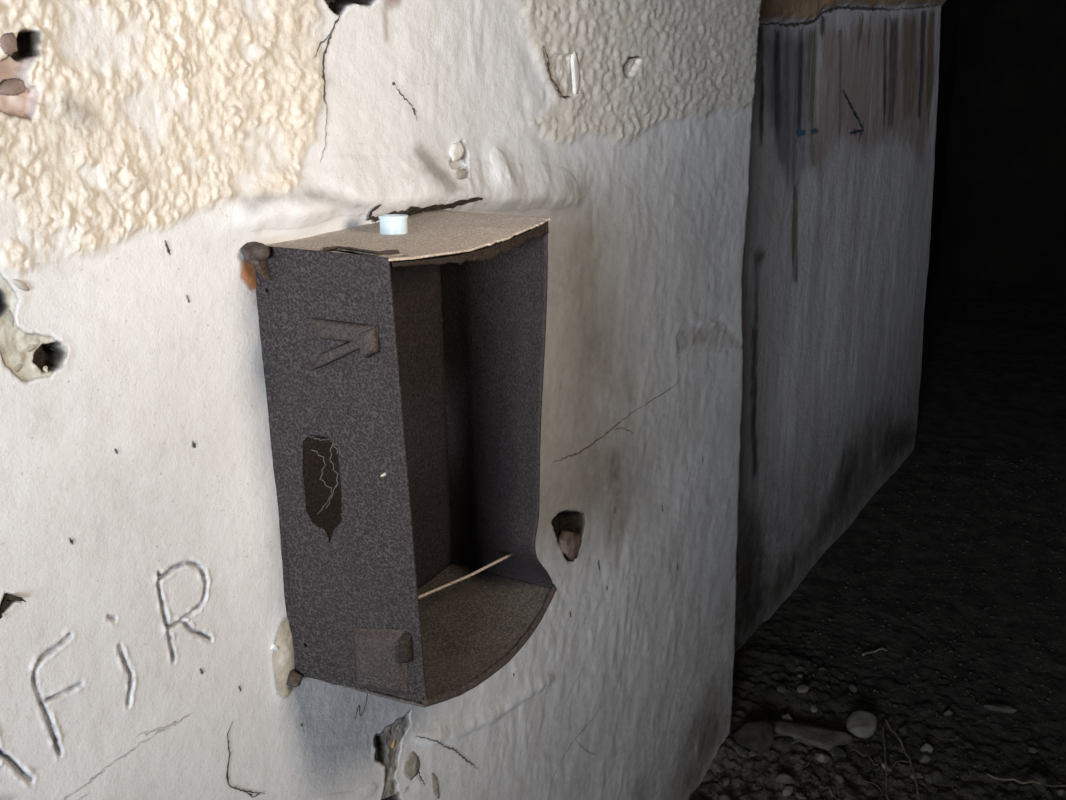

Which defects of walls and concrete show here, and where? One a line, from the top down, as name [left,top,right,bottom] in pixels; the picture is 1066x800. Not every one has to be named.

flaking render [325,0,373,15]
flaking render [0,30,40,119]
peeling [543,46,583,99]
water stain [759,12,934,281]
flaking render [0,275,67,381]
crack [554,379,680,462]
flaking render [552,512,585,562]
peeling [0,593,26,619]
crack [64,713,191,800]
flaking render [374,710,439,800]